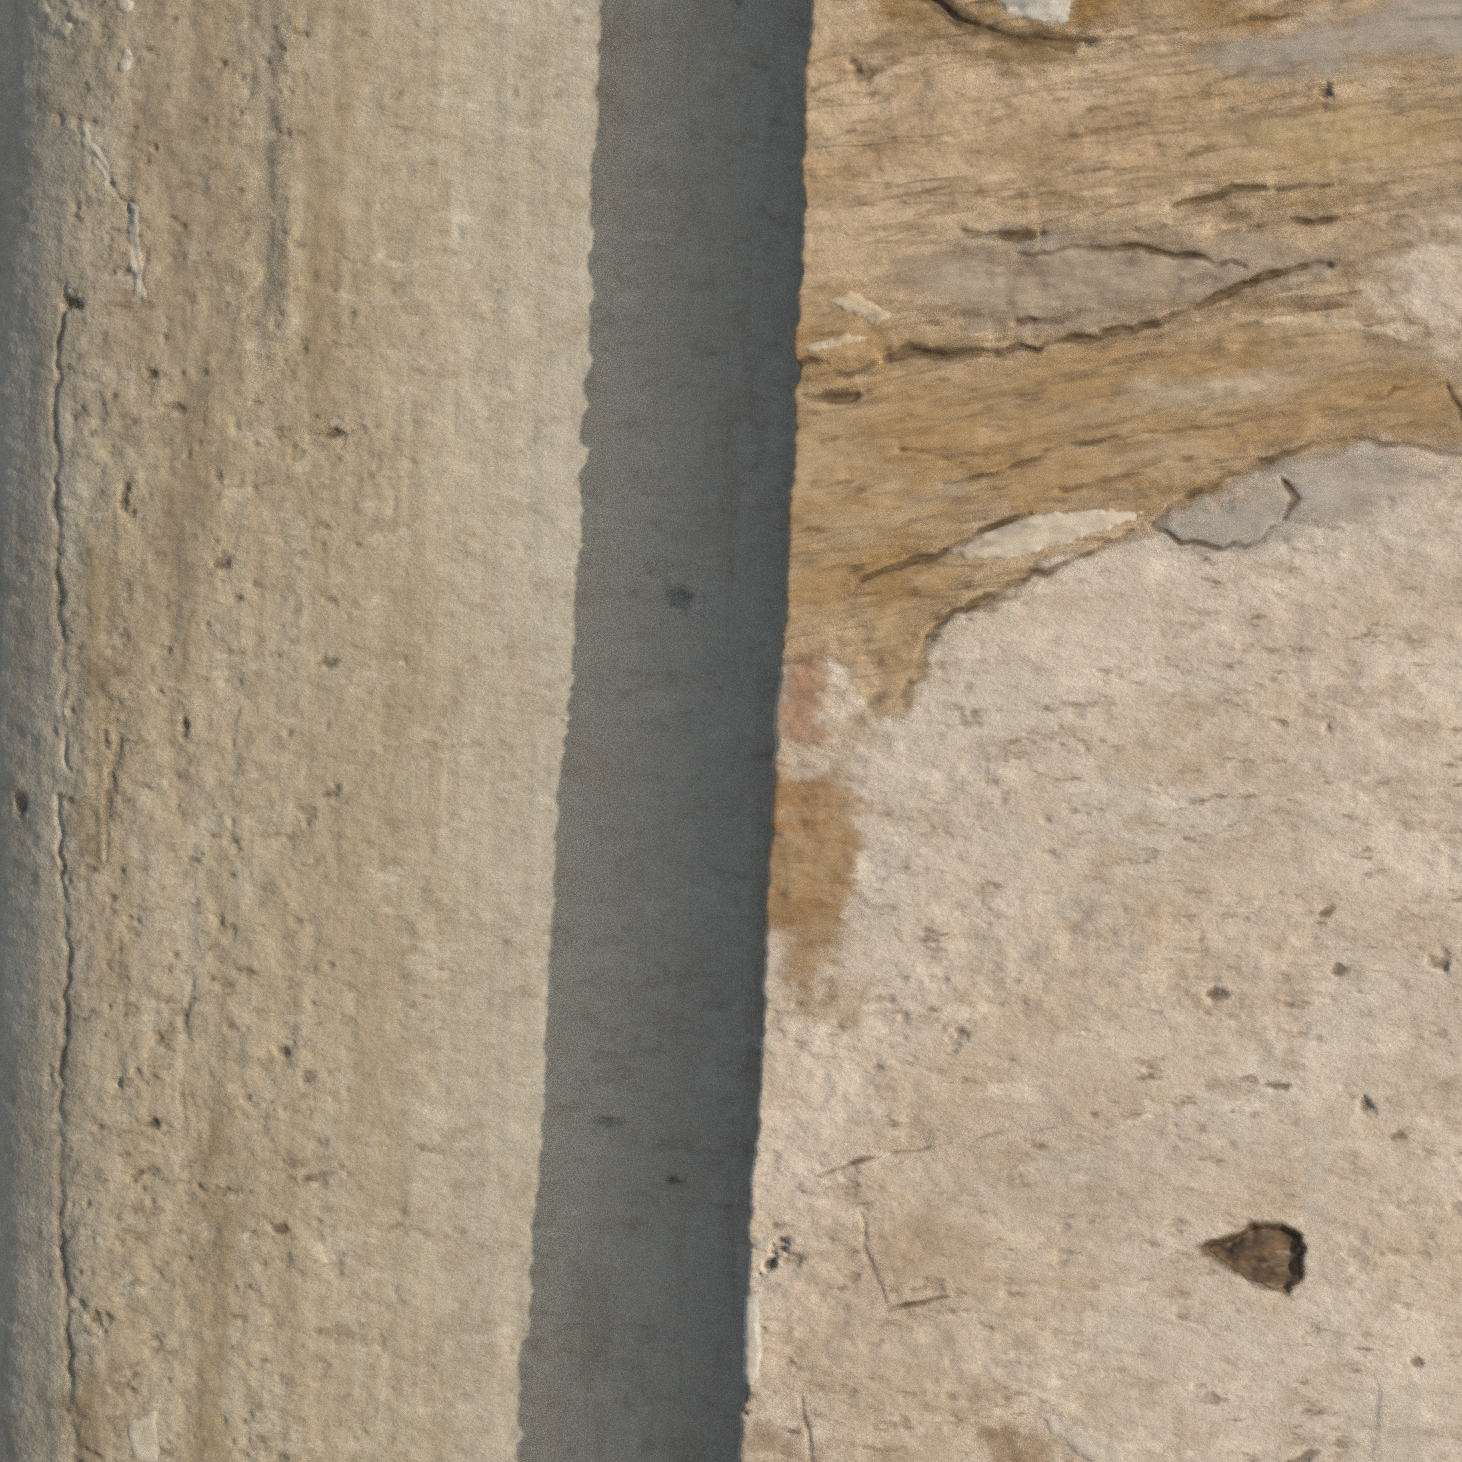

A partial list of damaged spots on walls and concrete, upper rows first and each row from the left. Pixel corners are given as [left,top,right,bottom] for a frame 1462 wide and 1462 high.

crack [923,0,981,33]
crack [1028,31,1070,49]
crack [1176,183,1335,224]
crack [1000,228,1036,255]
crack [799,243,1308,404]
peeling [779,0,1462,708]
spalling [1200,1222,1305,1294]